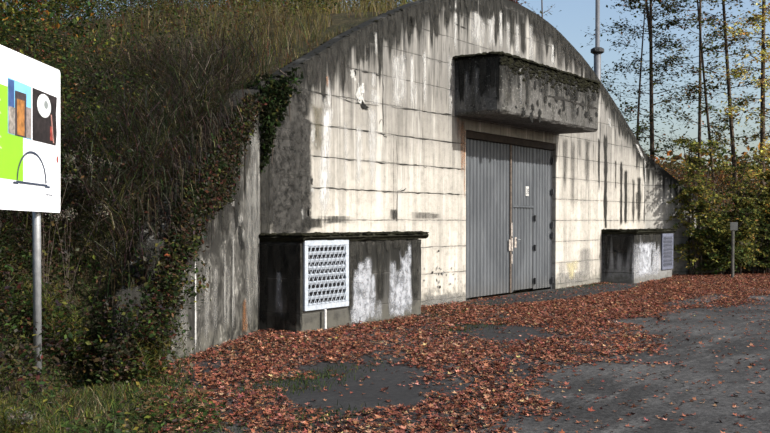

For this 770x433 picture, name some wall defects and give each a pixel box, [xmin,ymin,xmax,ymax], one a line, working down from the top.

damp [433,0,457,43]
damp [395,58,416,103]
damp [458,57,531,108]
damp [185,55,349,345]
damp [586,136,658,275]
damp [349,239,419,323]